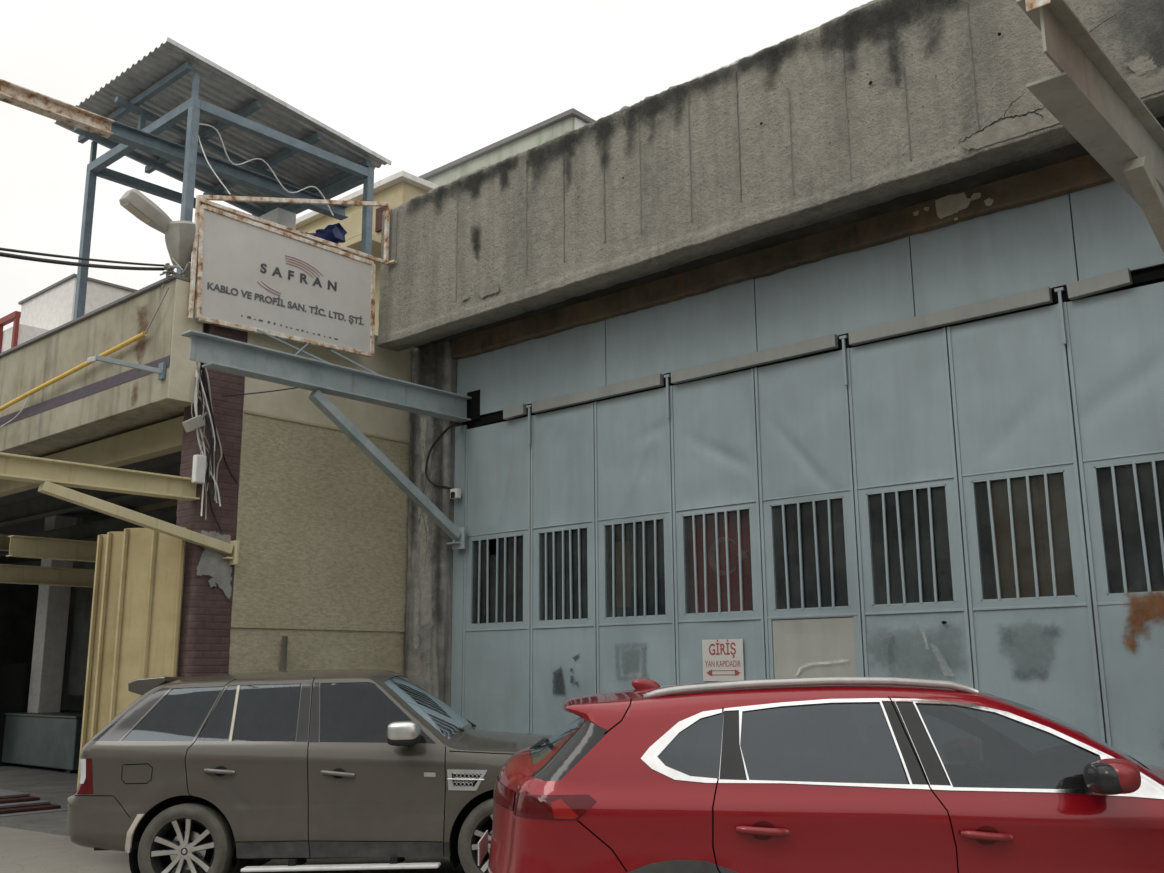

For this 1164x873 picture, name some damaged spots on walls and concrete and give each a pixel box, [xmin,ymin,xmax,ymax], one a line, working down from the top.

leakage [408,0,962,210]
peeling [913,192,994,220]
peeling [196,530,232,599]
corrosion [1126,592,1164,651]